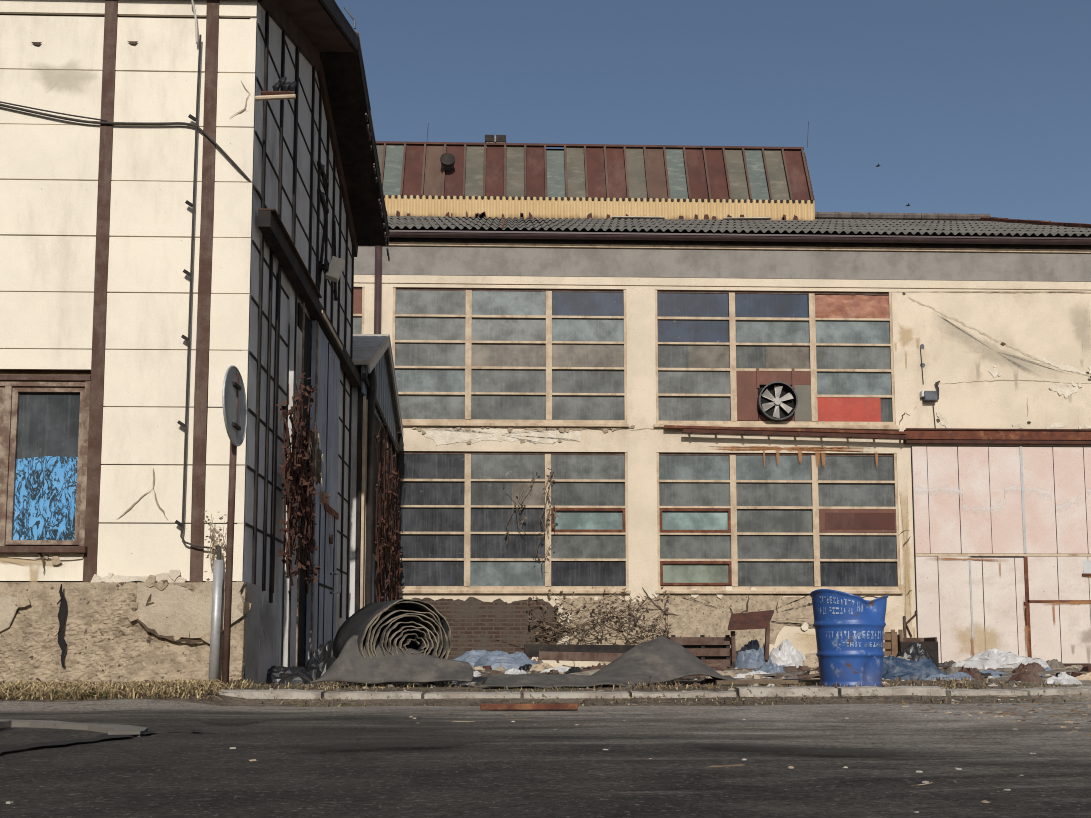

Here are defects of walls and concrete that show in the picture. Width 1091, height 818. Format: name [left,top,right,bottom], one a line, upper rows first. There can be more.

crack [945,380,1060,417]
spalling [399,586,819,660]